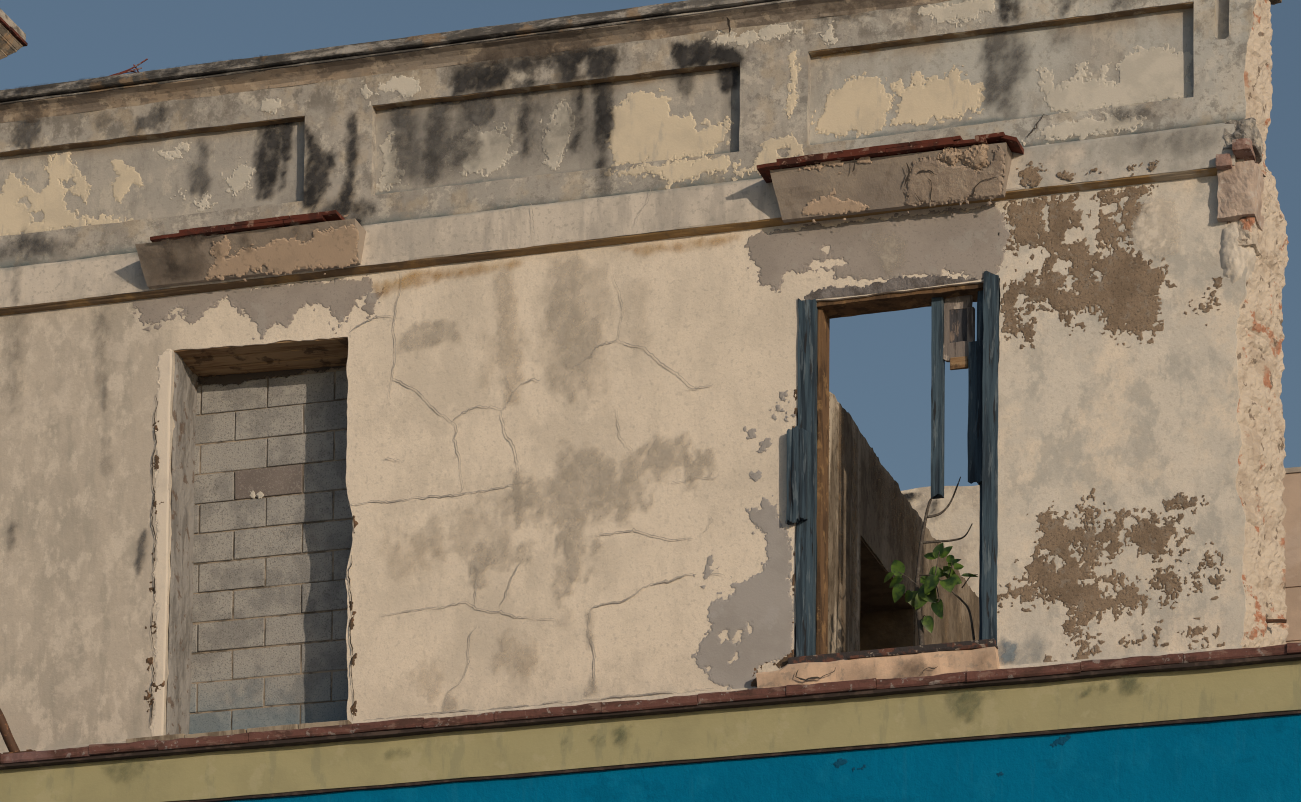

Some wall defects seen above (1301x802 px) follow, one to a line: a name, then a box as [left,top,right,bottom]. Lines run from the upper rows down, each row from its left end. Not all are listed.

leakage [255,114,375,226]
leakage [392,38,617,180]
leakage [671,39,743,92]
spalling [604,20,1194,349]
crack [904,162,936,202]
leakage [985,0,1024,109]
peeling [132,215,384,340]
crack [350,270,539,505]
crack [575,276,713,390]
crack [348,555,720,721]
peeling [691,495,795,690]
spalling [997,488,1231,662]